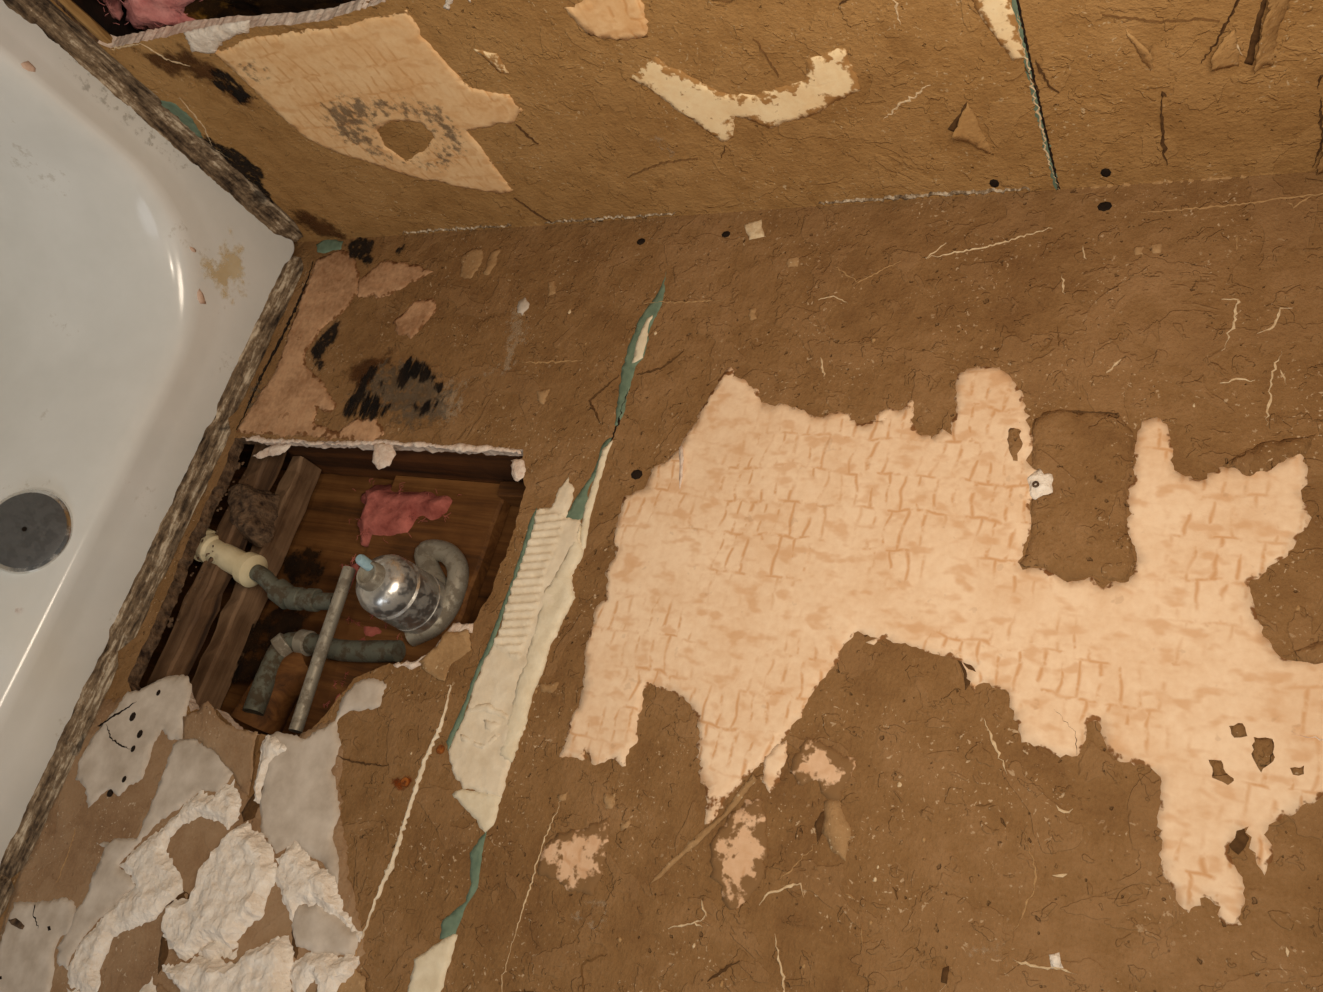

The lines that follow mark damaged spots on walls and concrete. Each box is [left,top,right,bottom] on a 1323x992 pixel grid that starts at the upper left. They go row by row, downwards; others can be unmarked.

leakage [184,0,355,19]
peeling [972,0,1026,61]
crack [1102,0,1240,63]
peeling [184,10,523,194]
peeling [630,48,861,142]
crack [1160,91,1168,165]
crack [1312,75,1323,168]
leakage [311,321,340,370]
peeling [236,248,526,481]
leakage [343,356,451,425]
peeling [559,366,1323,926]
flaking render [67,685,452,992]